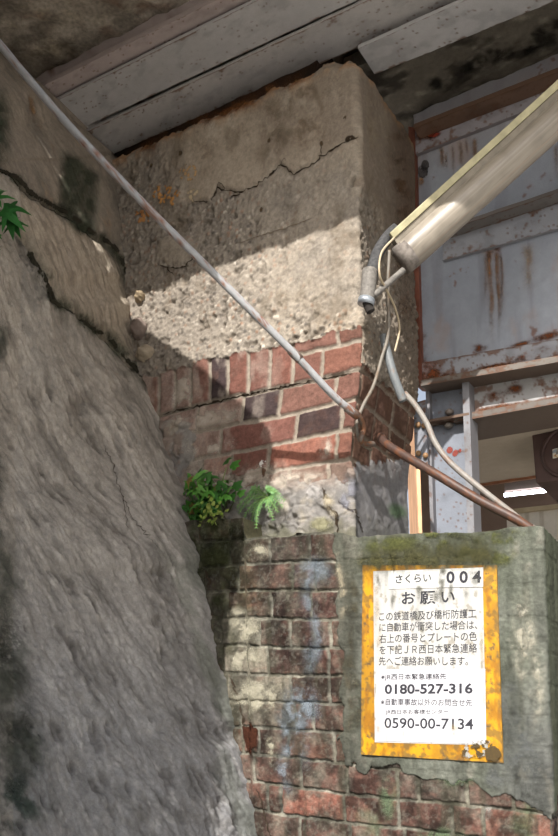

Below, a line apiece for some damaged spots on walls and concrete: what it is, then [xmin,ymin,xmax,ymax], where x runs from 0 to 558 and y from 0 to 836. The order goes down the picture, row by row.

water stain [524,22,558,54]
water stain [61,154,97,235]
crack [195,137,358,203]
rust [487,248,502,310]
rust [482,332,558,369]